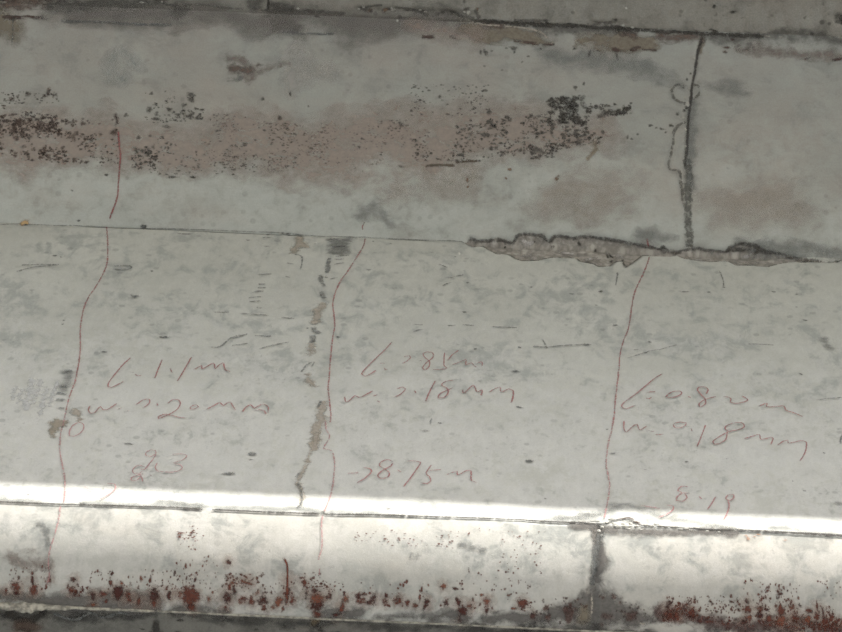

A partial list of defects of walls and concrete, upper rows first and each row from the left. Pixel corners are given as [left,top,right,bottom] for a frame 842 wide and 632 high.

water stain [0,88,128,176]
water stain [131,92,257,178]
water stain [253,82,632,172]
spalling [467,233,836,268]
crack [46,131,121,586]
crack [318,222,365,575]
crack [604,242,650,518]
rust [4,610,47,632]
rust [5,554,53,595]
rust [67,526,429,632]
rust [440,531,589,624]
rust [599,578,842,632]